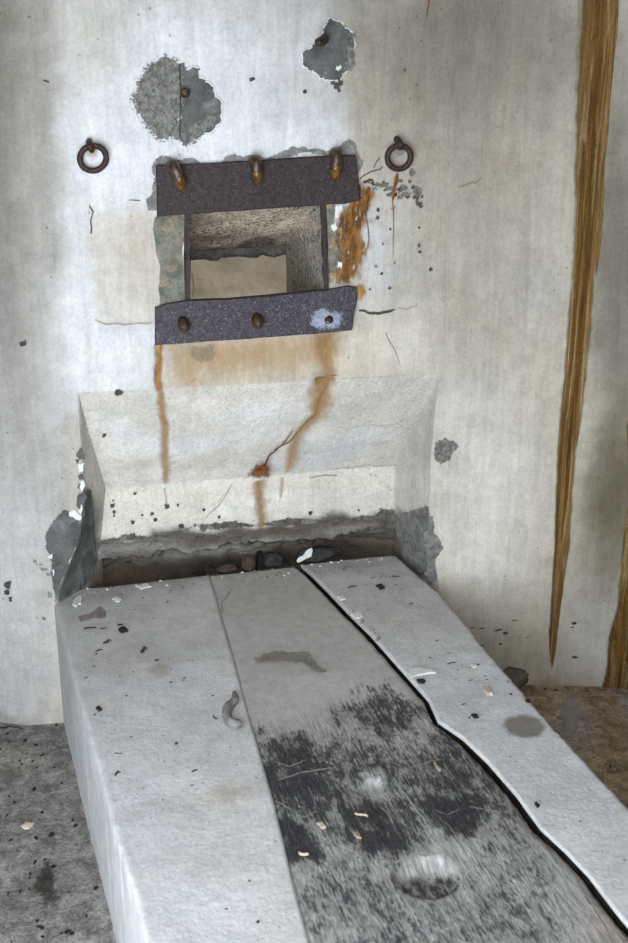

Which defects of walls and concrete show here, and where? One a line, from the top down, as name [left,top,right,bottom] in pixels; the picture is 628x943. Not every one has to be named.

spalling [129,54,224,147]
spalling [300,16,356,92]
corrosion [333,179,374,299]
corrosion [154,345,166,478]
corrosion [249,339,331,526]
spalling [434,438,459,464]
spalling [33,448,443,607]
leakage [255,651,327,672]
crack [301,568,628,937]
leakage [505,716,544,737]